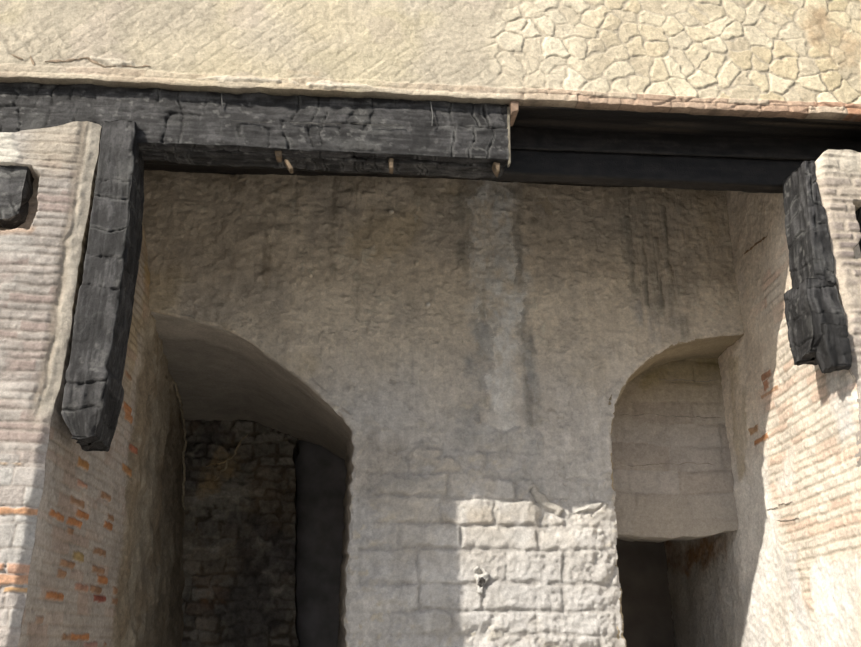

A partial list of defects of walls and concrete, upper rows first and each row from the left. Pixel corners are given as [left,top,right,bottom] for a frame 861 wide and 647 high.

leakage [442,179,556,493]
leakage [614,187,695,348]